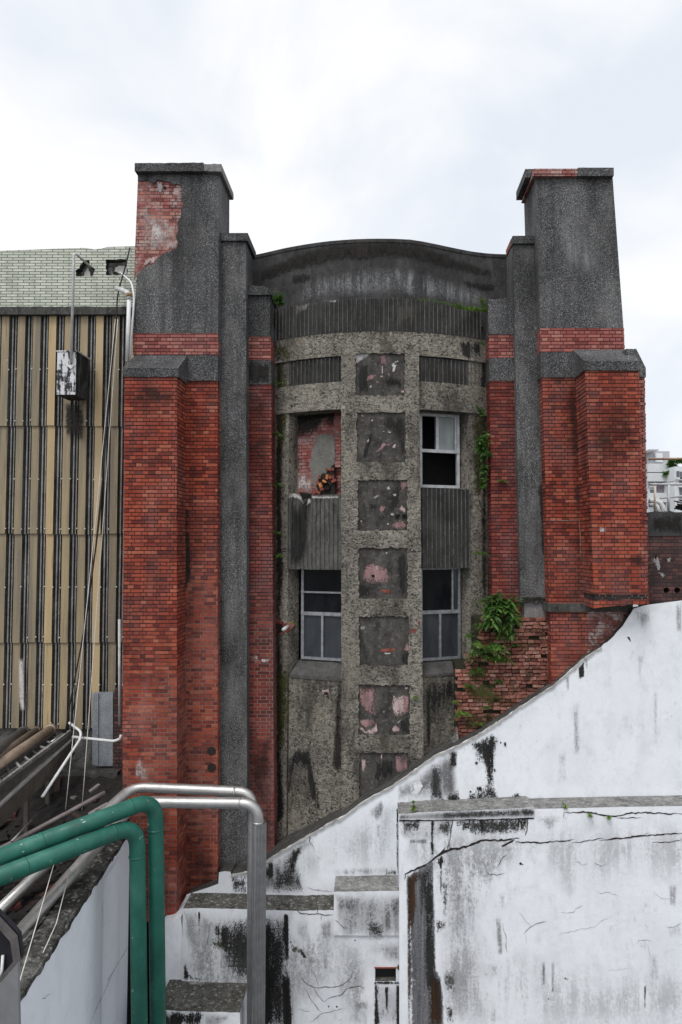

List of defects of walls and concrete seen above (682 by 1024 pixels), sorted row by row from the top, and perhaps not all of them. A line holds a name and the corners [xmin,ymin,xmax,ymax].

spalling [108,180,183,279]
peeling [356,353,398,388]
spalling [290,465,338,508]
peeling [363,564,391,594]
water stain [255,414,319,822]
peeling [360,687,409,734]
water stain [386,734,534,1021]
crack [404,811,682,880]
water stain [211,919,247,978]
water stain [265,914,306,1024]
crack [299,966,365,1022]
rust [407,861,444,1024]